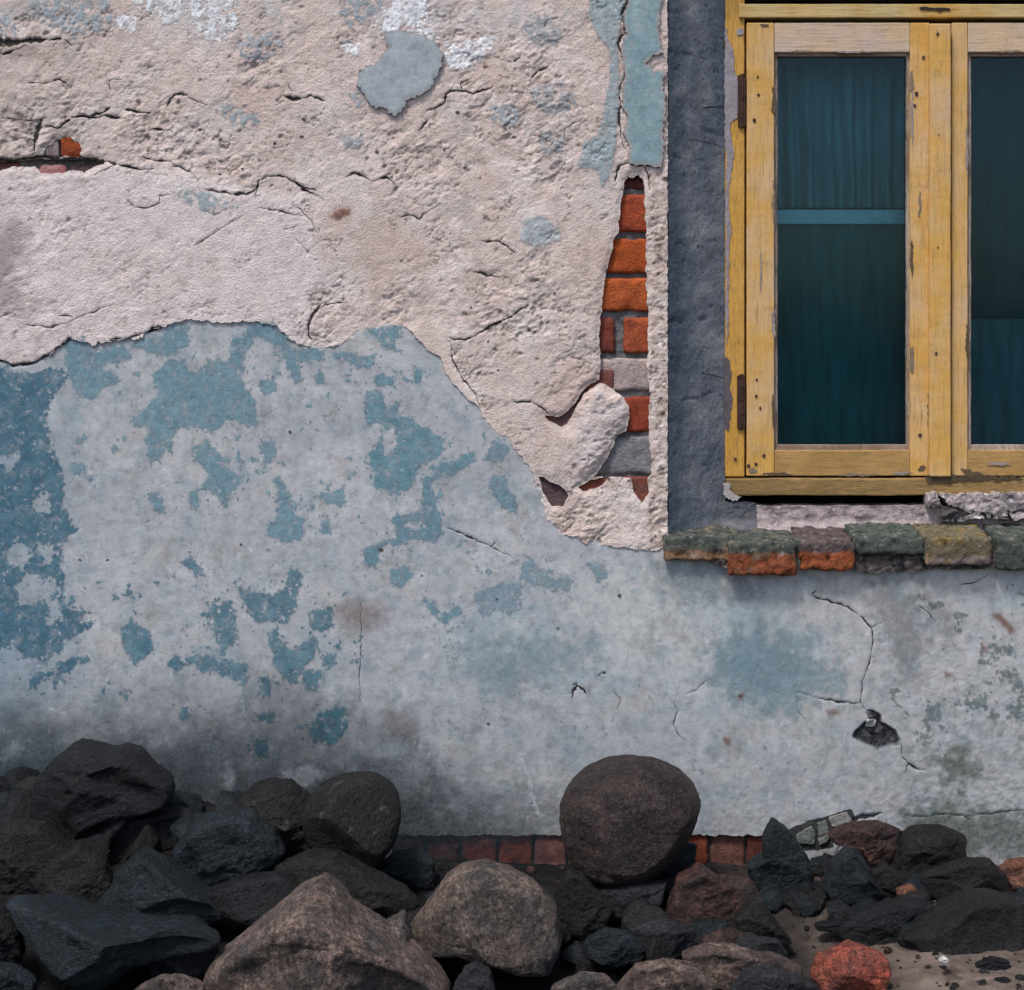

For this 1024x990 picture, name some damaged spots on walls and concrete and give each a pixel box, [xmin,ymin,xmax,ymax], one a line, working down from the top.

crack [0,37,72,55]
flaking render [0,137,104,174]
crack [0,78,324,253]
flaking render [329,0,497,154]
crack [418,77,490,131]
crack [613,0,650,189]
flaking render [486,0,667,507]
crack [0,304,112,367]
peeling [0,314,577,748]
peeling [580,554,621,598]
crack [796,591,882,717]
peeling [854,584,1024,761]